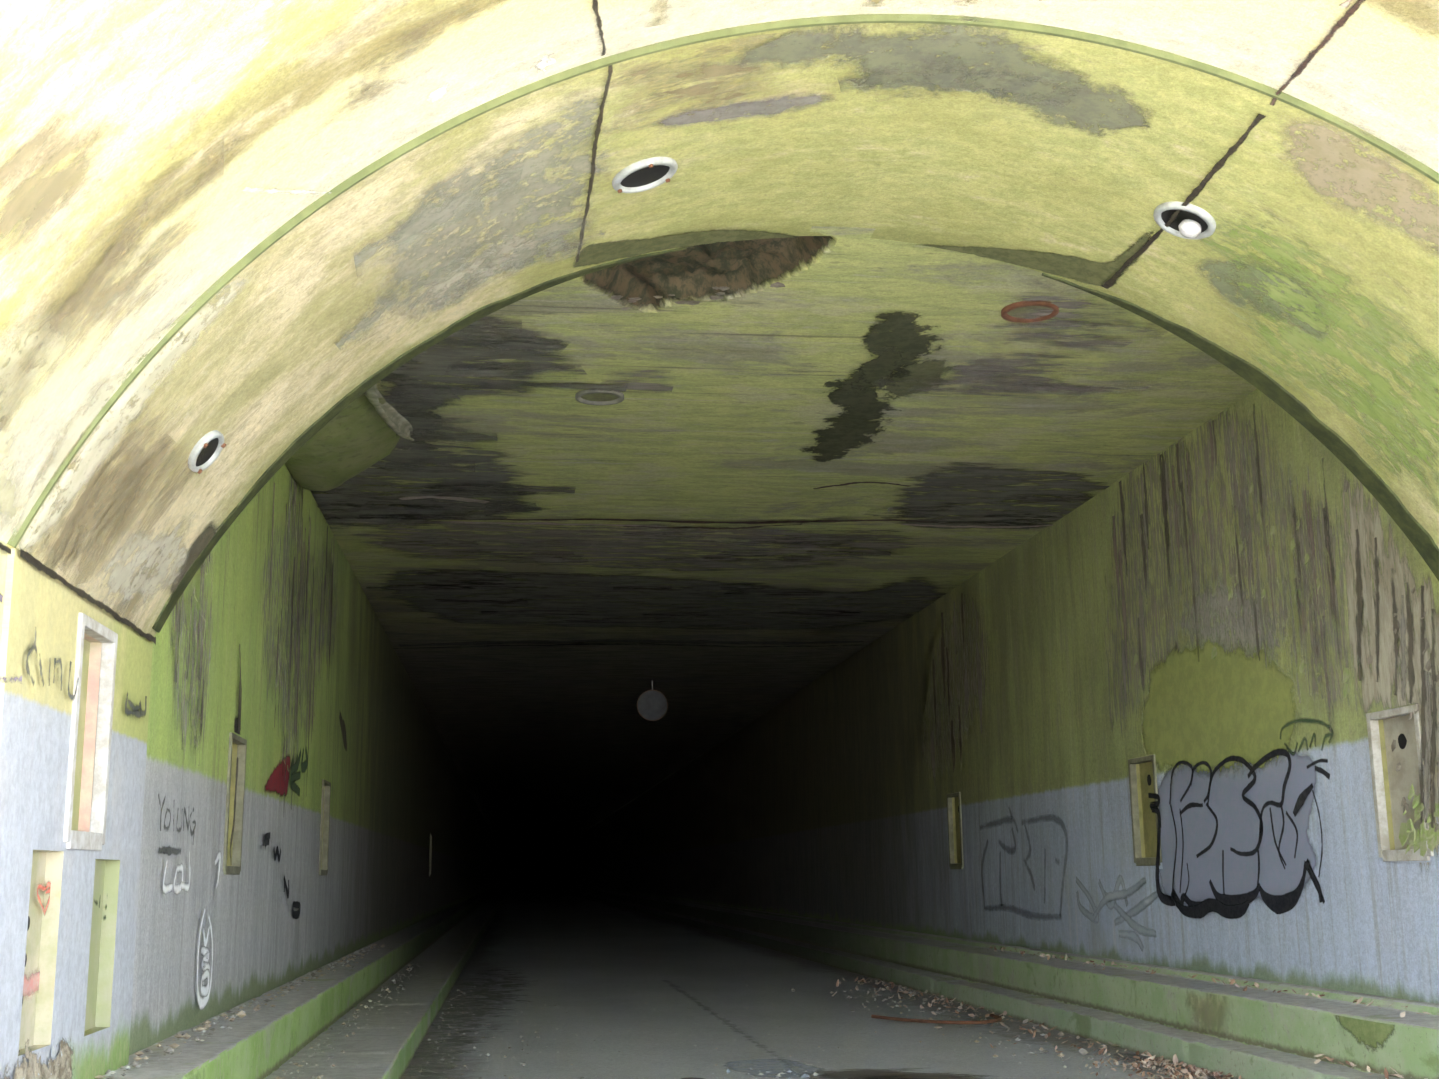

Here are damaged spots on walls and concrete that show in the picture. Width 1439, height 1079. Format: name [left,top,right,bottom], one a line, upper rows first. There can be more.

leakage [336,99,794,348]
crack [575,0,613,263]
leakage [627,18,1150,136]
leakage [799,232,1156,462]
crack [1102,0,1365,289]
leakage [310,317,1109,630]
spalling [3,1039,73,1079]